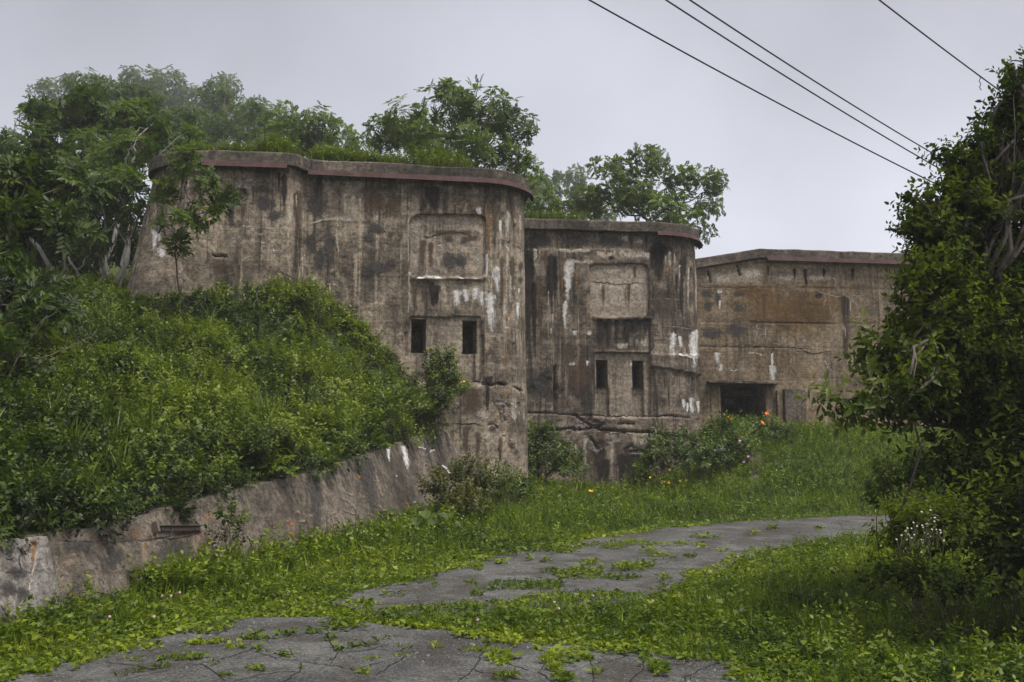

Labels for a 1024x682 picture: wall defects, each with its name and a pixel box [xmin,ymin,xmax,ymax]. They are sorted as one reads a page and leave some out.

leakage [363,188,403,241]
leakage [411,202,687,396]
leakage [670,289,767,365]
crack [467,377,694,447]
leakage [682,398,700,413]
leakage [386,432,452,476]